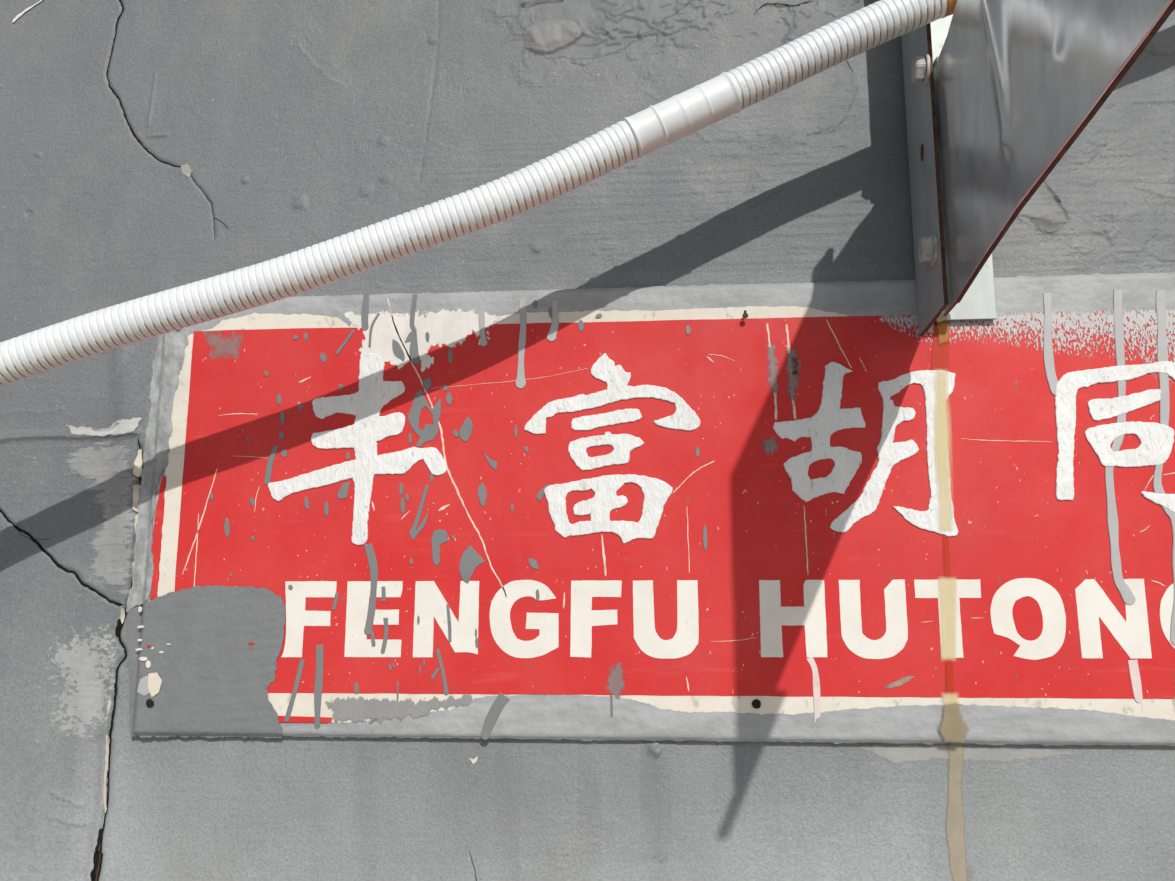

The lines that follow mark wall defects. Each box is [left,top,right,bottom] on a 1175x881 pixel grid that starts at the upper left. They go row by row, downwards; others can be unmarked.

crack [106,0,228,239]
peeling [521,0,692,60]
peeling [1145,9,1175,55]
crack [0,438,143,881]
rust [932,321,969,881]